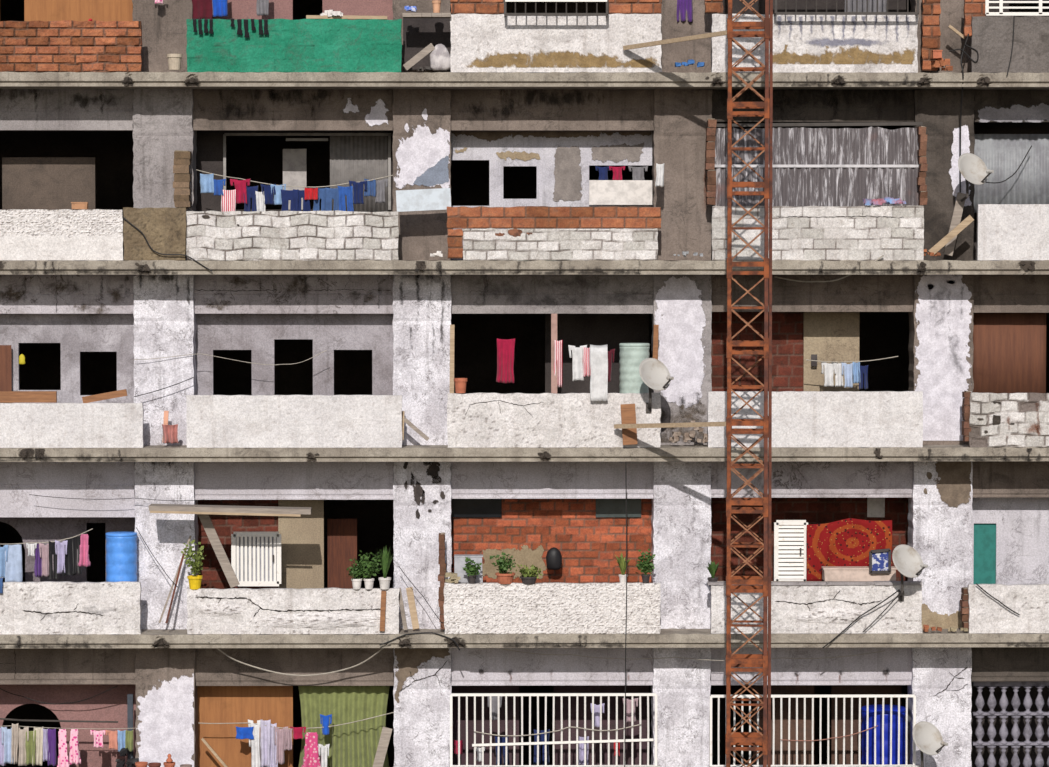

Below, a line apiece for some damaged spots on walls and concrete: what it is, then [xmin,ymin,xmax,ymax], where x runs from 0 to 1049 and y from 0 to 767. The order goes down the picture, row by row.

peeling [343,98,389,127]
peeling [394,108,652,201]
peeling [949,103,1049,206]
peeling [655,276,706,409]
peeling [915,261,972,441]
spalling [978,401,1014,434]
peeling [924,461,971,508]
crack [23,603,103,621]
crack [775,591,881,611]
peeling [921,603,962,629]
peeling [136,674,194,767]